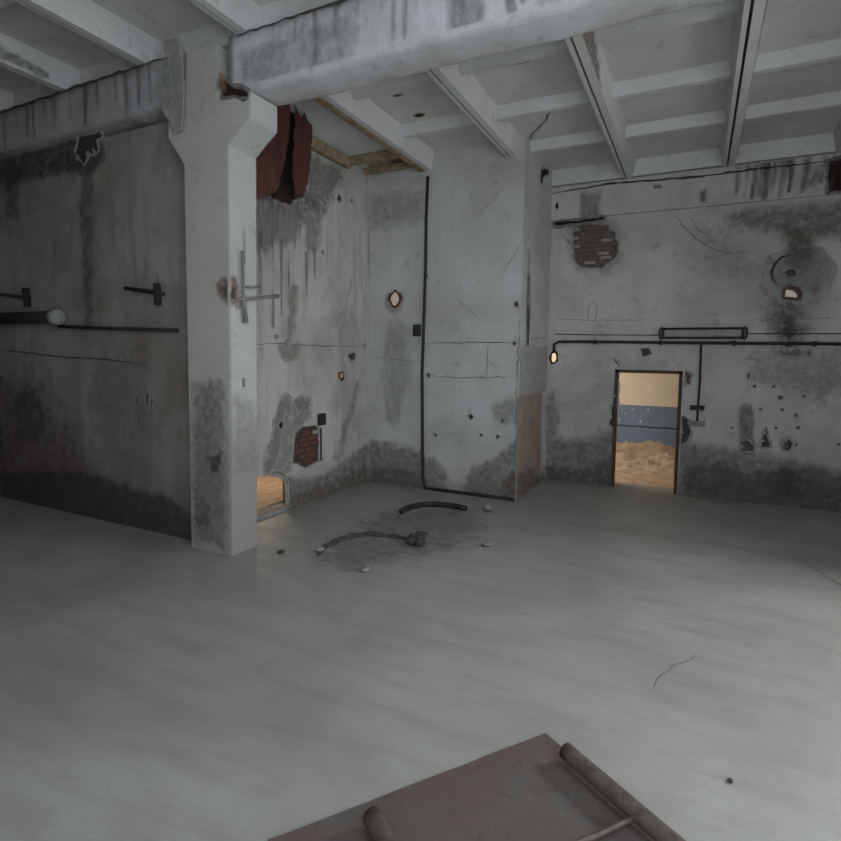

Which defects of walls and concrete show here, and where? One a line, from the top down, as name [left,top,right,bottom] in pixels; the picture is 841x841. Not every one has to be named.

leakage [256,155,345,271]
flaking render [553,214,620,269]
peeling [262,393,310,509]
flaking render [292,424,320,469]
leakage [267,399,445,508]
leakage [467,439,612,499]
leakage [680,408,841,511]